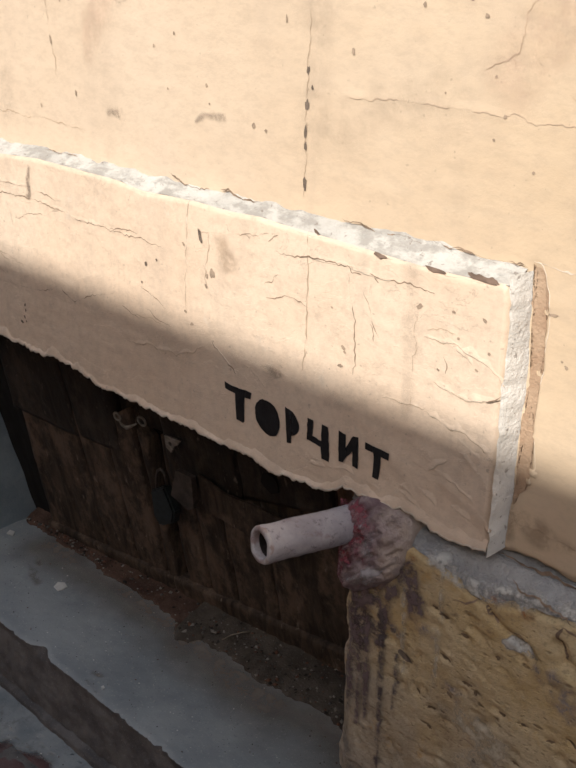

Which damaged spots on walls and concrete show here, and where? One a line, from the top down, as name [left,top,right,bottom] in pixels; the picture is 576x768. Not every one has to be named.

crack [305,0,313,96]
crack [486,0,538,70]
crack [0,178,161,247]
crack [201,232,435,374]
peeling [468,272,499,285]
spalling [513,261,551,505]
leakage [337,497,425,768]
leakage [429,553,576,621]